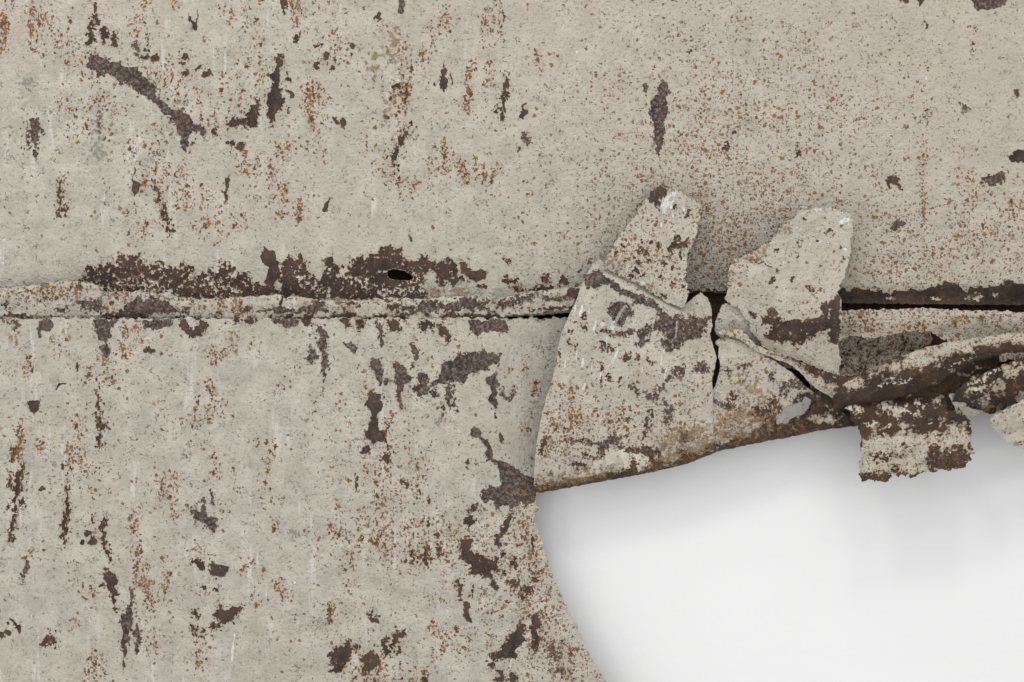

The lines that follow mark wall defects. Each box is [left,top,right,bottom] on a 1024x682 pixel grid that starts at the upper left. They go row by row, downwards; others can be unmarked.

peeling [614,235,686,299]
corrosion [748,280,1024,346]
corrosion [0,0,818,682]
peeling [966,361,1020,405]
peeling [776,396,811,425]
peeling [845,398,941,437]
peeling [568,447,651,479]
corrosion [860,442,911,482]
corrosion [927,433,973,472]